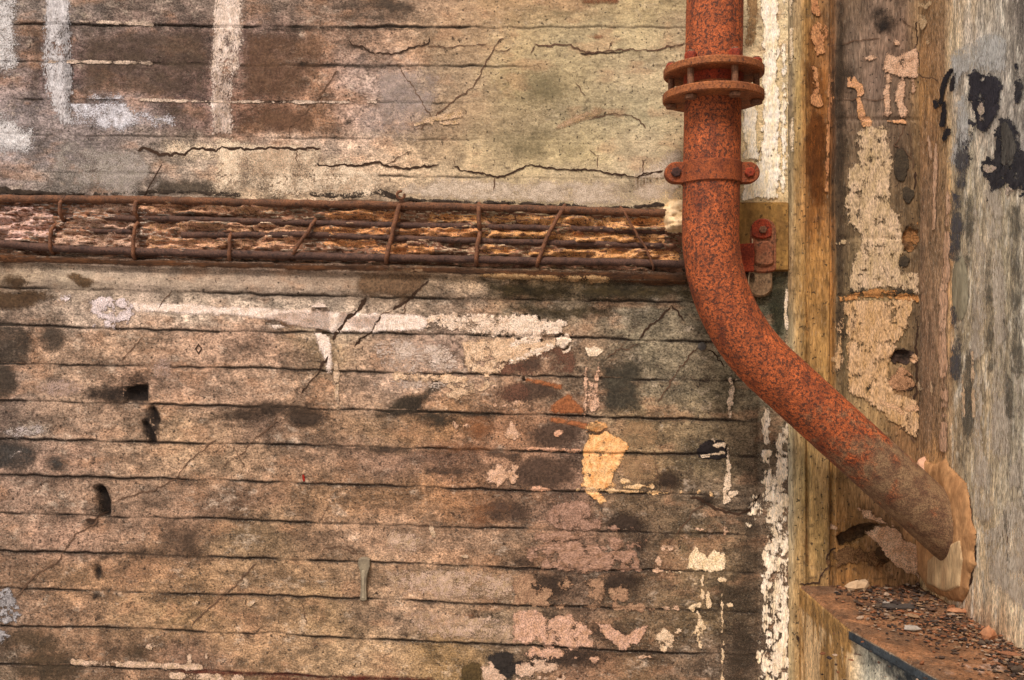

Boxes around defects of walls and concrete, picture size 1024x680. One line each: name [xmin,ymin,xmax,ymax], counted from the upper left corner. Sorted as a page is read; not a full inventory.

crack [137,71,663,190]
crack [349,36,684,129]
spalling [0,162,683,272]
rust [0,253,687,286]
peeling [831,1,1012,452]
crack [301,279,429,394]
rust [526,378,588,429]
peeling [374,310,738,680]
peeling [746,407,789,680]
spalling [844,579,870,592]
spalling [826,507,919,578]